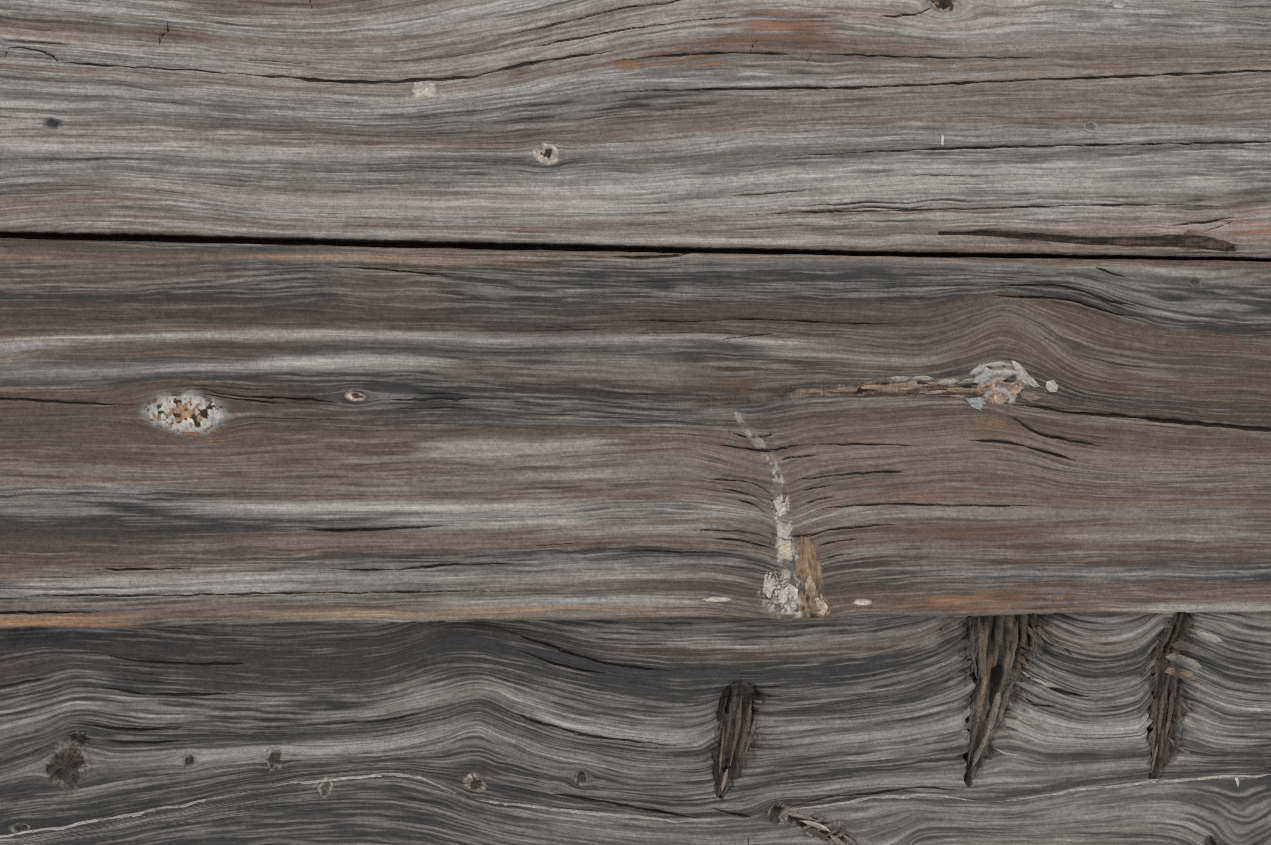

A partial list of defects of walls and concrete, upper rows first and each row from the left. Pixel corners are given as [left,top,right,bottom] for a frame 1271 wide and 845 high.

crack [756,204,1232,240]
crack [695,428,1028,559]
crack [789,613,1089,809]
crack [1140,612,1224,782]
crack [1204,835,1223,845]